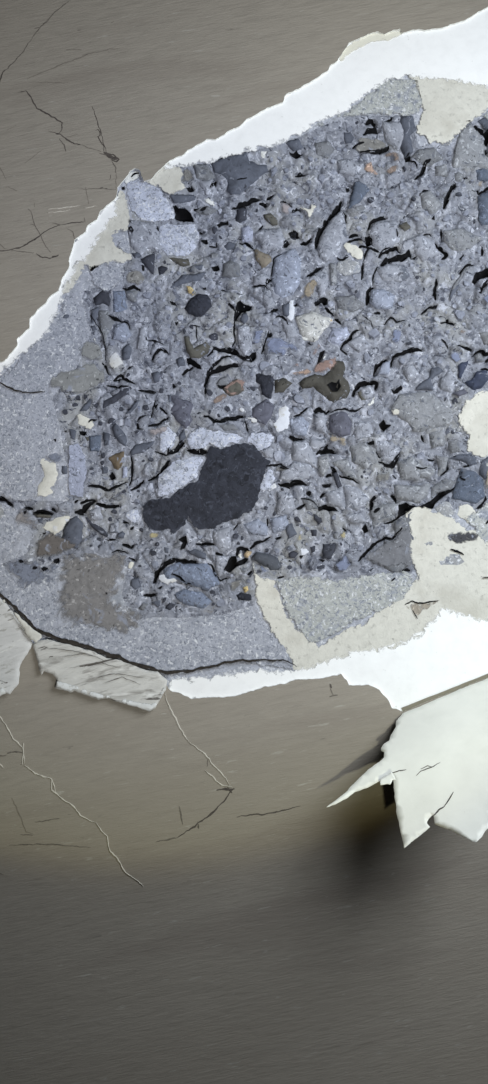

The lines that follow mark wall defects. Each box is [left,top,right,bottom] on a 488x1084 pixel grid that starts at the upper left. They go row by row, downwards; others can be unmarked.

crack [0,0,120,259]
spalling [0,8,488,712]
crack [0,716,143,886]
crack [0,593,297,787]
peeling [380,772,396,785]